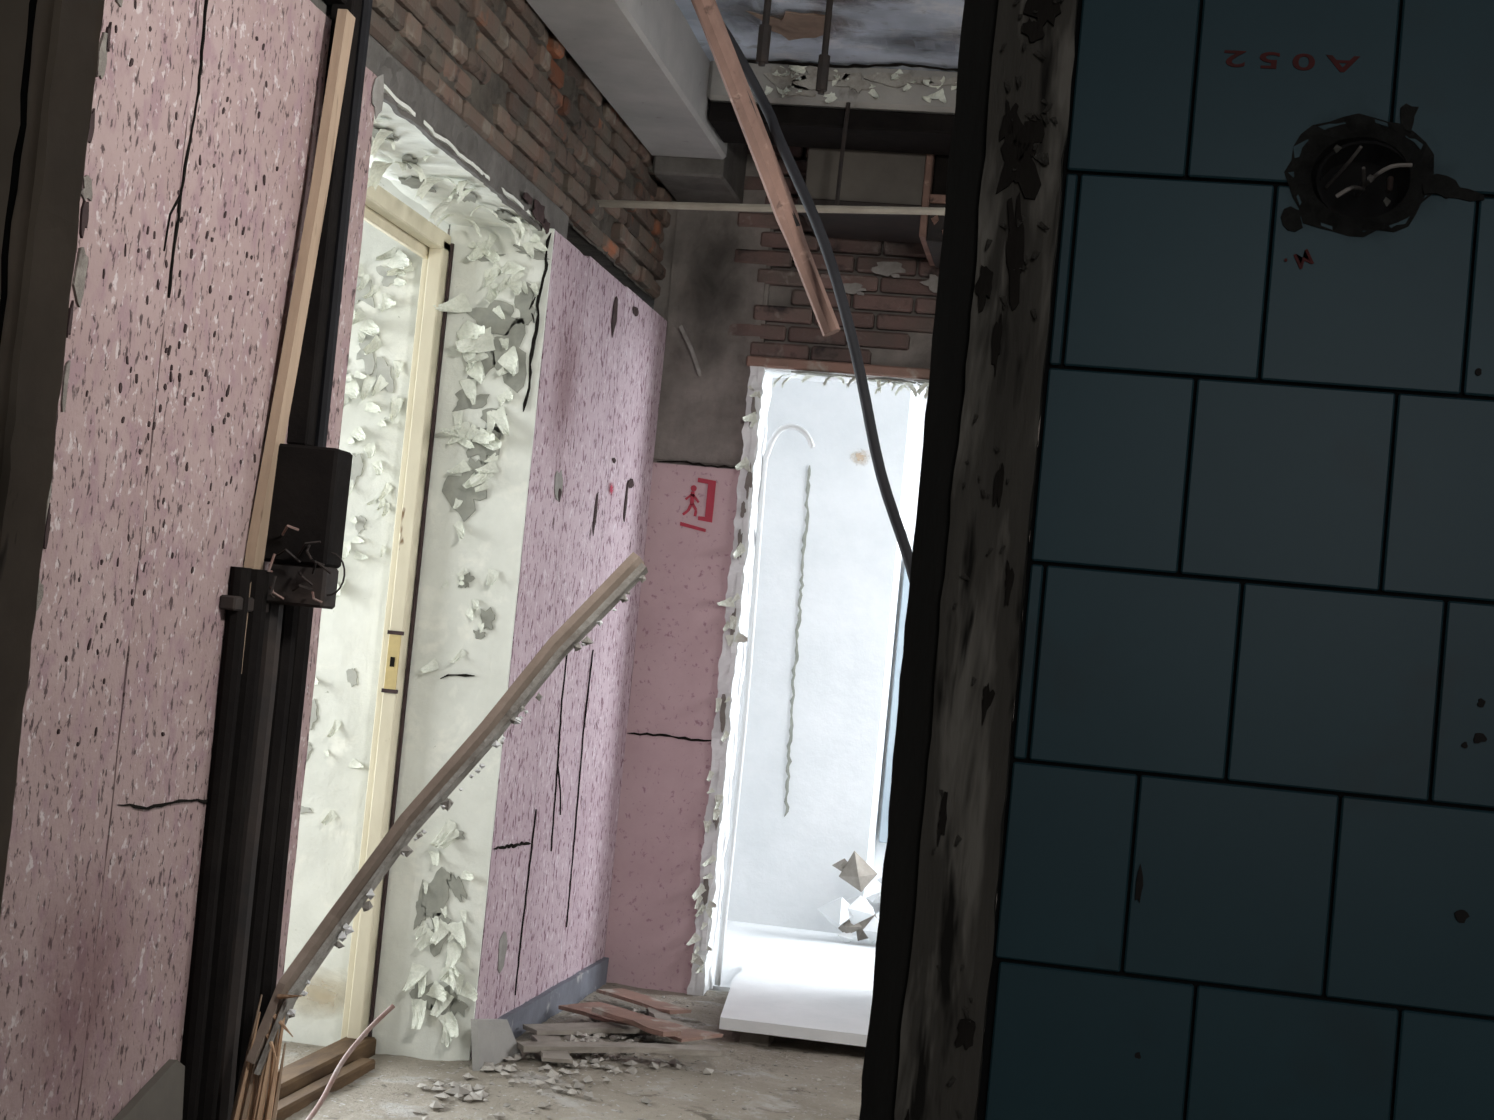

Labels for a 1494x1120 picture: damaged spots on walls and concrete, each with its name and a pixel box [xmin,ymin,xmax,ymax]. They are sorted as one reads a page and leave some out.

crack [163,0,209,298]
spalling [1281,103,1484,237]
peeling [367,119,550,540]
peeling [342,247,414,560]
peeling [733,457,753,559]
peeling [717,593,748,646]
crack [628,732,711,742]
peeling [715,694,730,742]
crack [494,650,594,995]
peeling [703,771,724,833]
peeling [686,855,717,973]